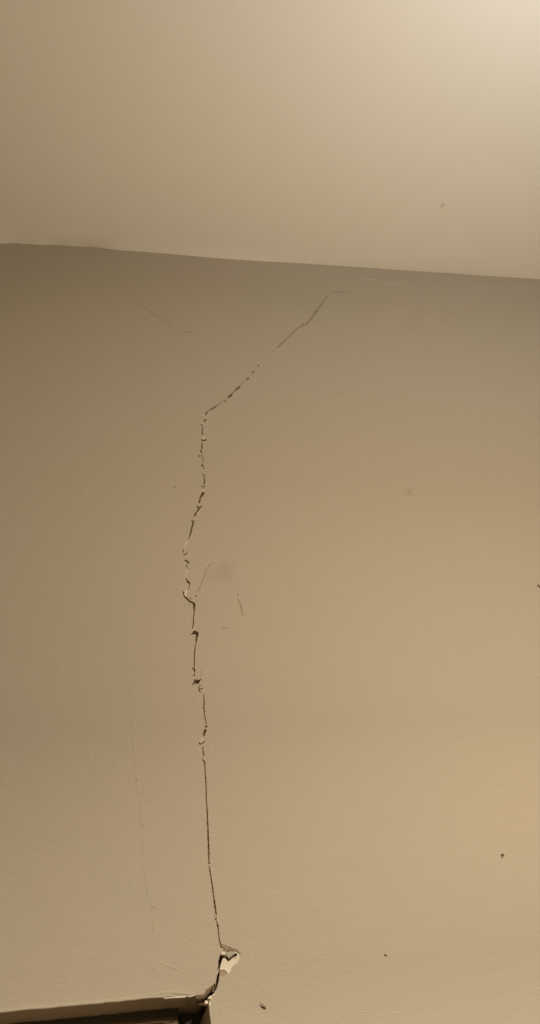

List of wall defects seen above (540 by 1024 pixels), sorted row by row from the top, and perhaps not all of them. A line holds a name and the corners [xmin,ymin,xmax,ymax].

flaking render [163,945,241,1007]
crack [182,291,351,992]